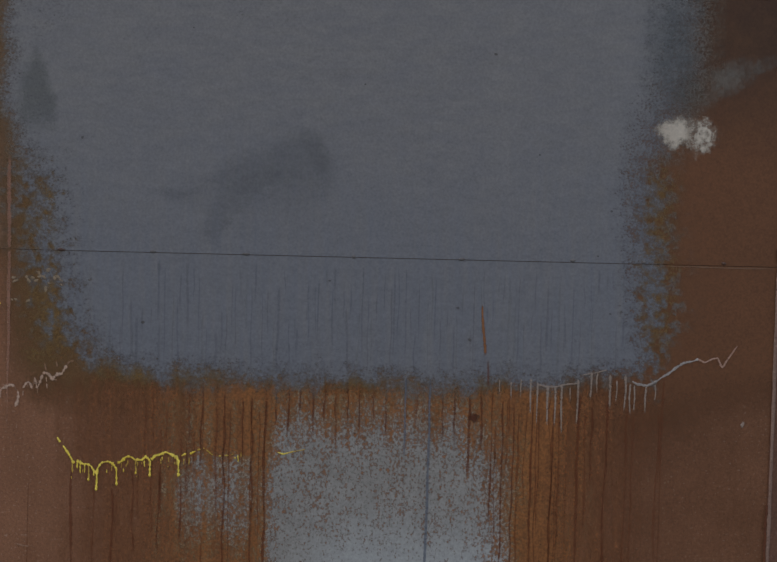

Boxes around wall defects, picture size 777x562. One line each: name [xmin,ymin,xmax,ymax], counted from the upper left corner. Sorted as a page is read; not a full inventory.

leakage [0,0,461,401]
leakage [474,0,777,448]
rust [76,367,630,562]